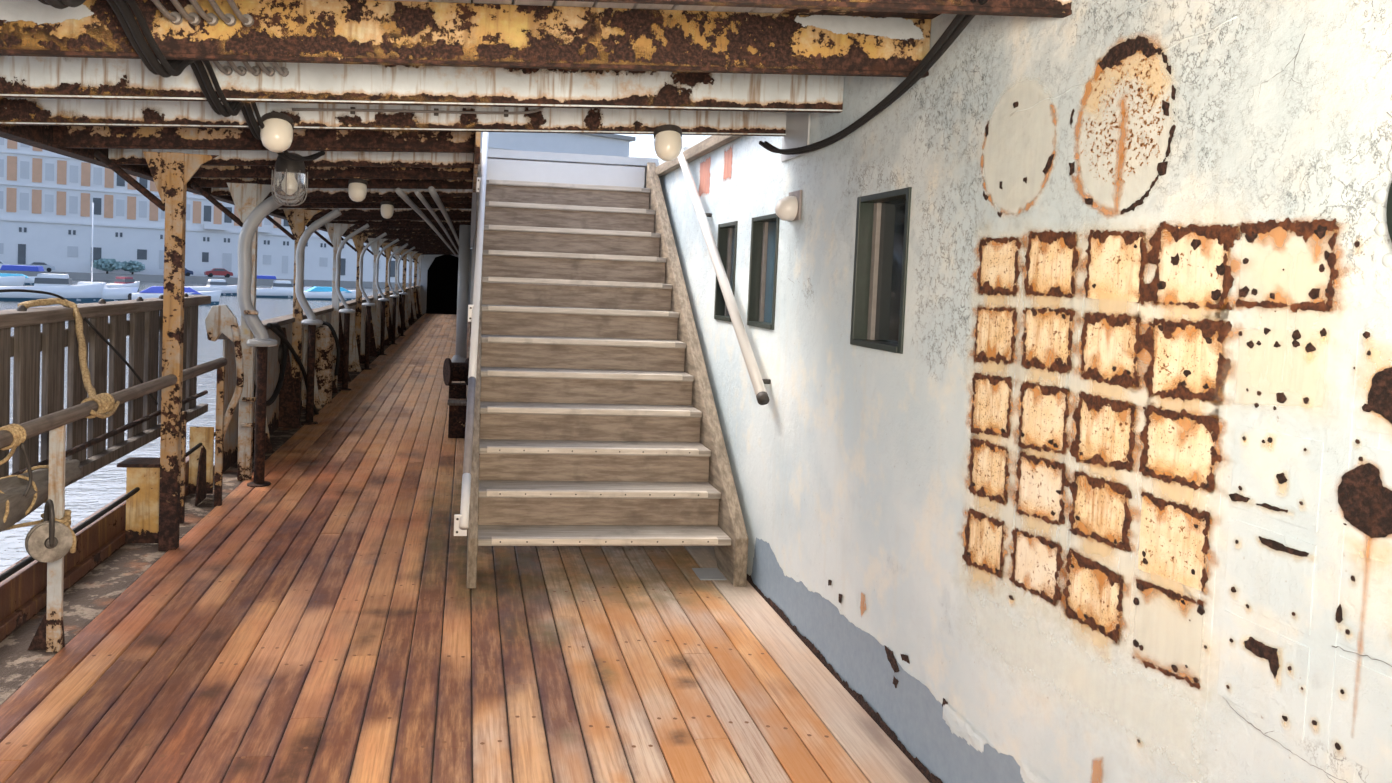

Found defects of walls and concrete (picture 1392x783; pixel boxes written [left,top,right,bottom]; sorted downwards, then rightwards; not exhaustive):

rust [0,0,192,56]
rust [222,2,816,109]
rust [0,75,174,126]
rust [240,91,485,128]
rust [524,107,547,130]
rust [583,108,605,133]
rust [981,35,1176,218]
rust [1362,367,1392,424]
rust [1338,463,1392,558]
peeling [751,538,1050,783]